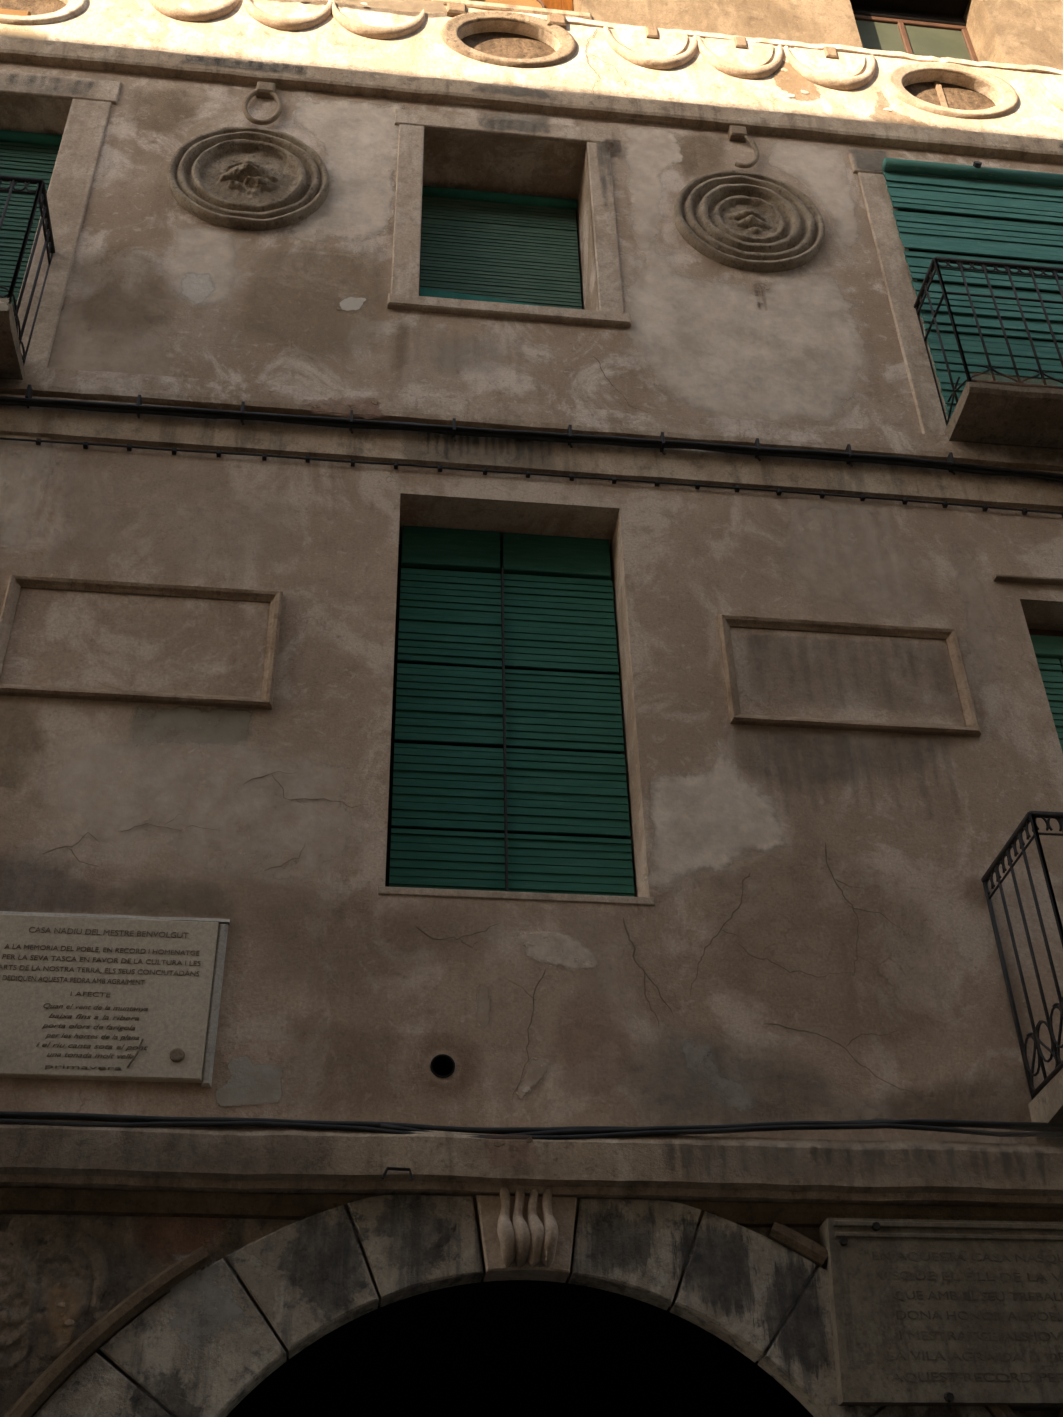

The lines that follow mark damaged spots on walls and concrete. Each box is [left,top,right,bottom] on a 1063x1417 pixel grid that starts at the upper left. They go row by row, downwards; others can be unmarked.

peeling [170,228,237,304]
flaking render [337,297,366,311]
crack [243,771,366,808]
crack [43,814,216,867]
flaking render [521,933,597,969]
crack [623,842,902,1027]
crack [505,969,546,1100]
crack [770,1023,921,1098]